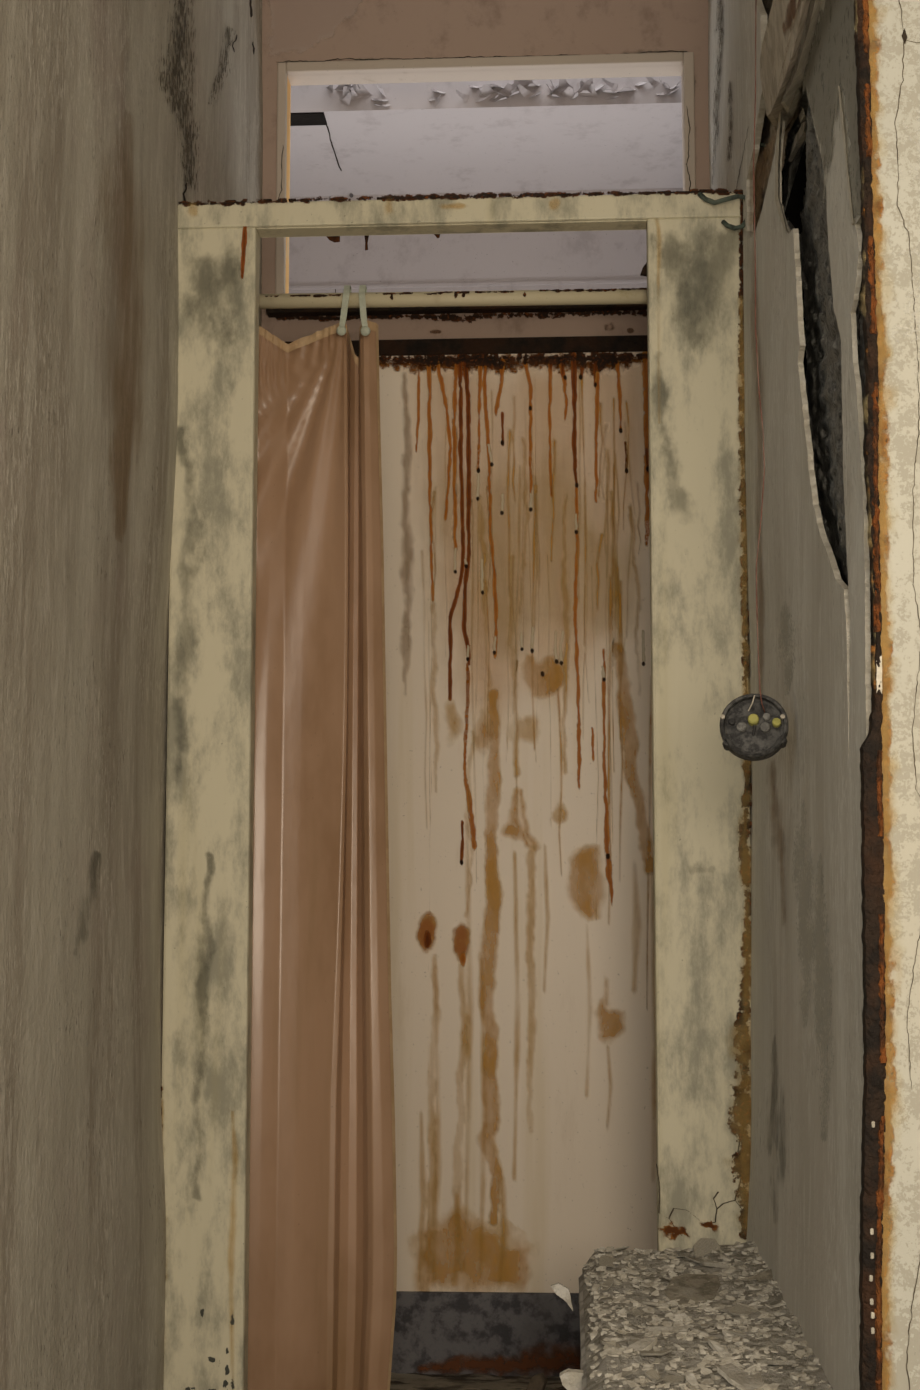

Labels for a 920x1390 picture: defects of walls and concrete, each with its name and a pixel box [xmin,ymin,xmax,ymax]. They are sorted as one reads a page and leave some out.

corrosion [417,913,436,950]
corrosion [454,925,470,966]
corrosion [178,188,750,695]
damp [423,690,534,1284]
corrosion [379,351,650,903]
corrosion [727,760,752,1240]
spalling [753,0,866,586]
corrosion [864,0,898,1390]
crack [894,1,920,796]
crack [907,935,920,1087]
crack [906,1261,920,1390]